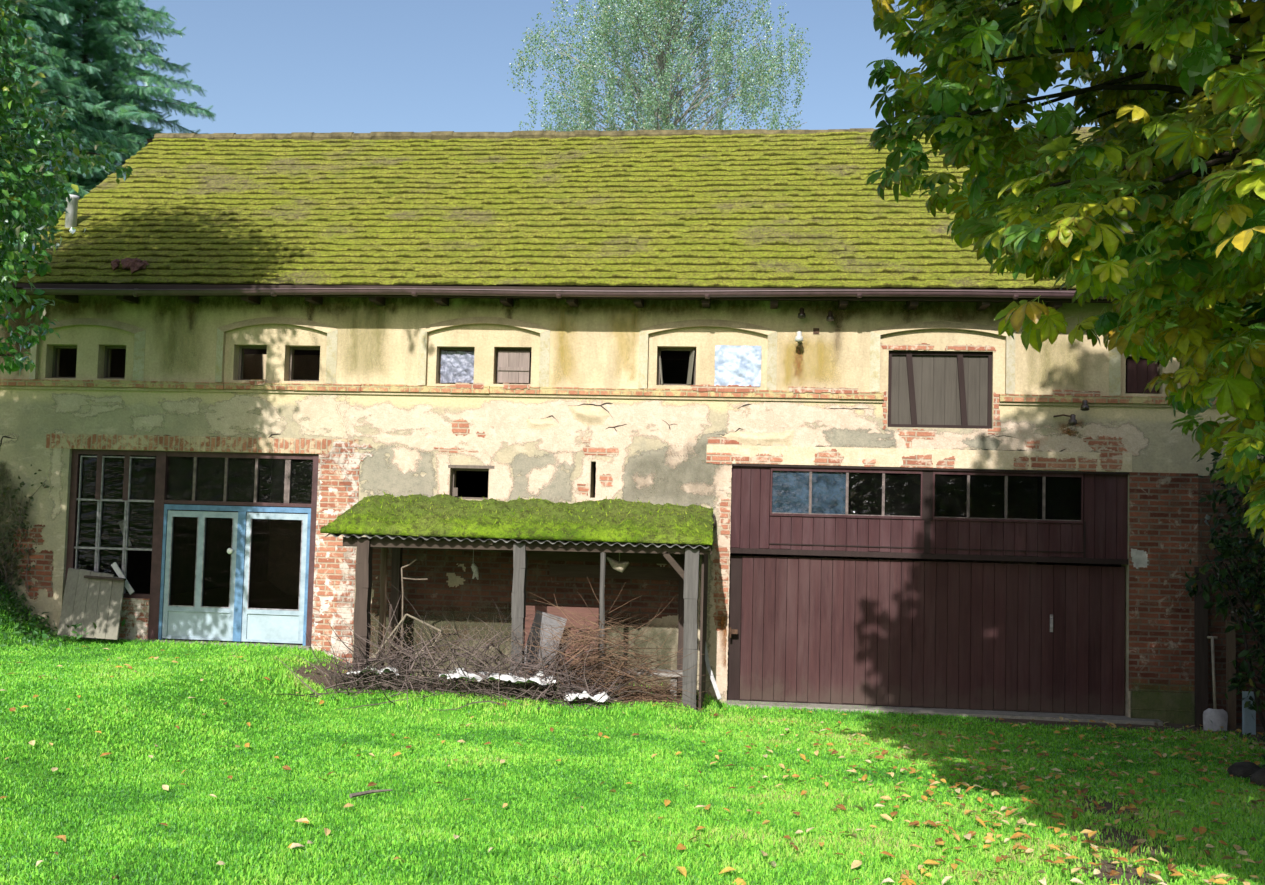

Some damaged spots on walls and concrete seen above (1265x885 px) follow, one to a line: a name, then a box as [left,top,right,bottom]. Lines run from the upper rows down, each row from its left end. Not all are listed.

leakage [2,296,439,361]
leakage [464,298,759,332]
leakage [784,301,1020,329]
spalling [11,430,65,600]
flaking render [204,379,1149,698]